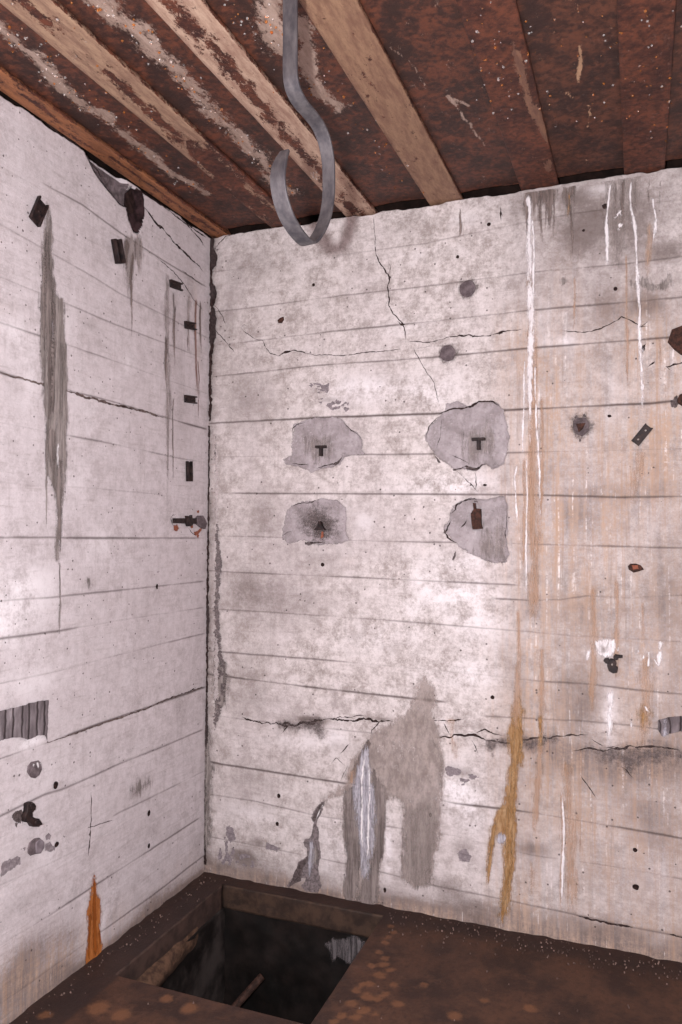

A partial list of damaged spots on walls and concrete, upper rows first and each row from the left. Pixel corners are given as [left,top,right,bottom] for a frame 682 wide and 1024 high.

water stain [40,208,68,633]
crack [47,187,521,865]
spalling [282,498,349,545]
spalling [283,383,365,473]
spalling [425,401,510,563]
water stain [514,185,576,585]
crack [567,316,682,371]
water stain [328,677,444,904]
corrosion [486,670,524,923]
crack [434,719,682,777]
corrosion [85,875,103,964]
spalling [115,801,383,1024]